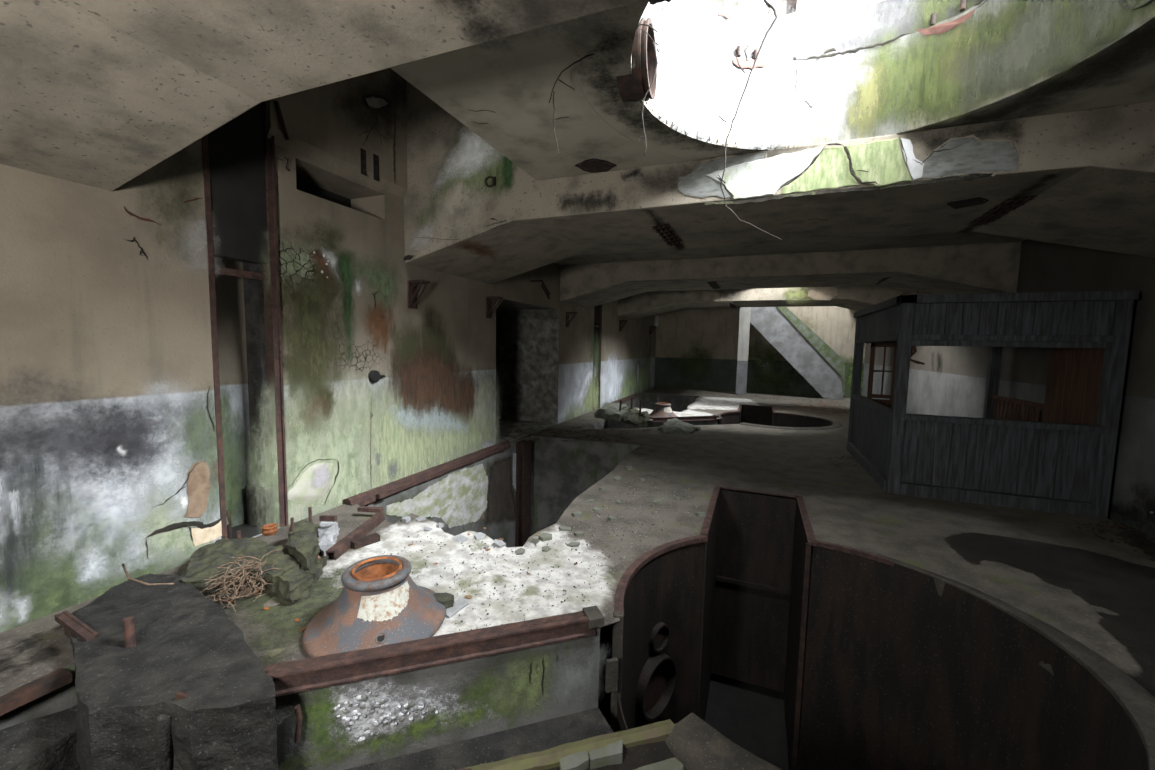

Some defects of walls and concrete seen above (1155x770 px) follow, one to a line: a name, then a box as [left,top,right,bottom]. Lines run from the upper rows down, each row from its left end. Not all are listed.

spalling [733,57,767,68]
spalling [916,9,975,36]
crack [782,143,879,187]
crack [901,141,971,166]
water stain [278,248,360,432]
rust [369,307,475,427]
water stain [0,403,190,594]
spalling [184,461,229,547]